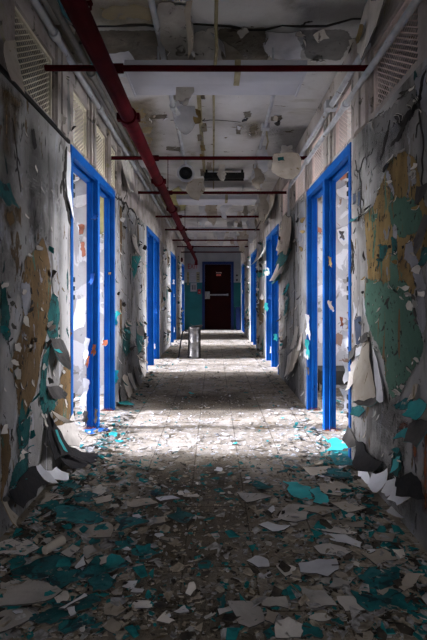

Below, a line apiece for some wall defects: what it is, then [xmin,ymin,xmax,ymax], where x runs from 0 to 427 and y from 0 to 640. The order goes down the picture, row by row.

peeling [218,27,271,60]
peeling [295,29,354,62]
peeling [367,65,427,134]
peeling [0,237,71,502]
peeling [115,205,148,377]
peeling [276,195,305,381]
peeling [353,148,427,404]
peeling [381,447,402,479]